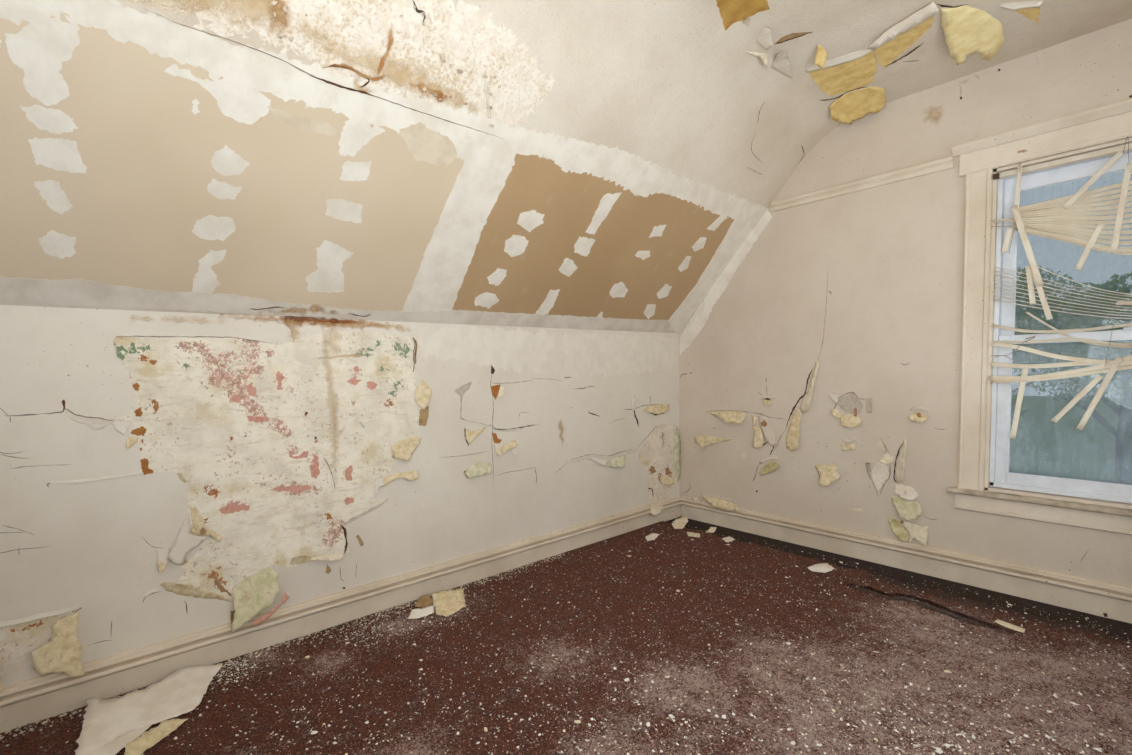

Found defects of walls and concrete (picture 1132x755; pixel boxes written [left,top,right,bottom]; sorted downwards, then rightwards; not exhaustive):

water stain [199,0,287,27]
flaking render [191,0,556,127]
crack [0,400,115,430]
peeling [111,330,432,633]
peeling [454,382,519,479]
peeling [554,396,732,517]
peeling [705,360,819,482]
peeling [829,392,872,428]
peeling [865,436,937,547]
peeling [0,606,112,691]